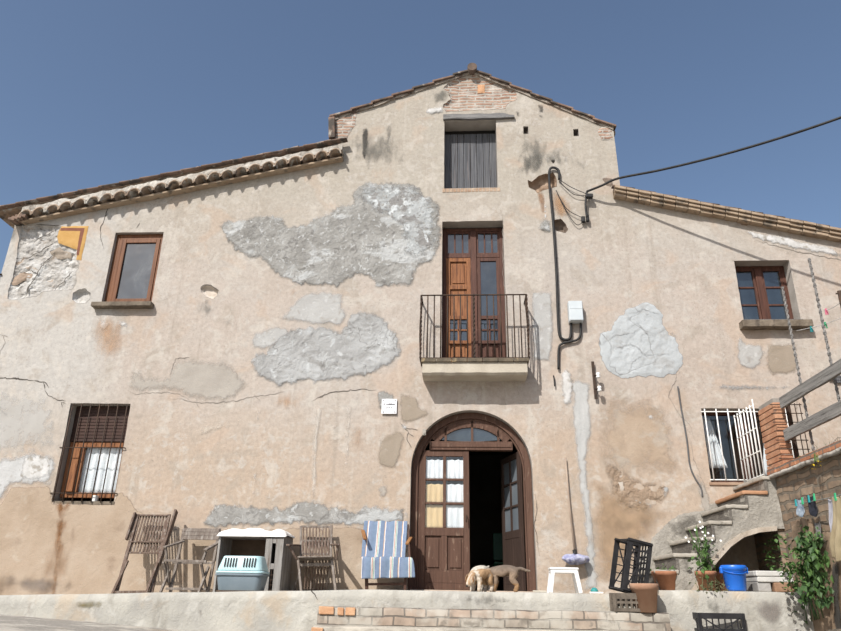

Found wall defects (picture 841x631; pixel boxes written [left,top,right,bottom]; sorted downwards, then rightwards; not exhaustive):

flaking render [426,75,517,113]
flaking render [7,224,91,303]
crack [4,377,64,405]
crack [135,392,280,406]
leakage [562,370,652,588]
flaking render [607,465,668,510]
flaking render [0,455,217,595]
flaking render [285,527,404,591]